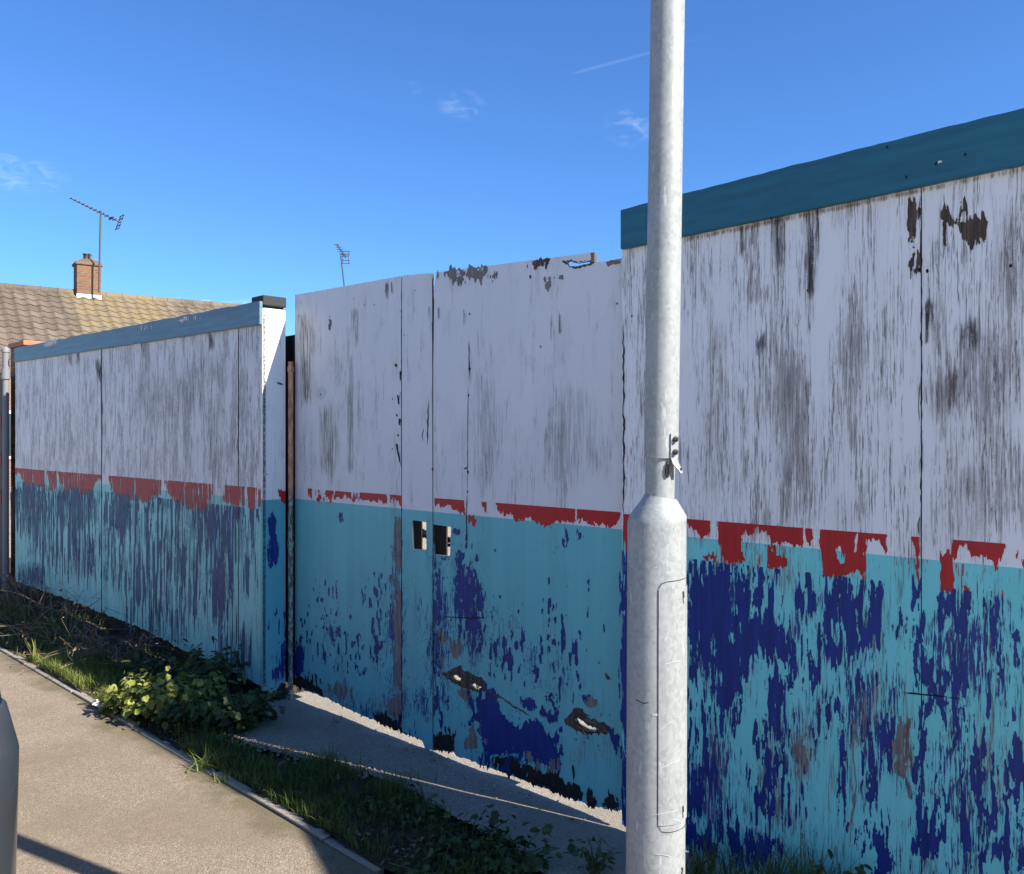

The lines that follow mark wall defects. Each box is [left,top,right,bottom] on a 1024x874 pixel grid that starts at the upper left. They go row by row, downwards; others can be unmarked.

peeling [437,264,498,286]
peeling [527,257,563,291]
leakage [772,217,785,262]
leakage [804,209,819,294]
peeling [907,197,922,279]
peeling [940,196,988,251]
leakage [925,299,933,343]
leakage [960,321,977,347]
leakage [937,371,956,405]
peeling [10,468,280,676]
peeling [268,488,630,828]
peeling [685,519,1024,874]